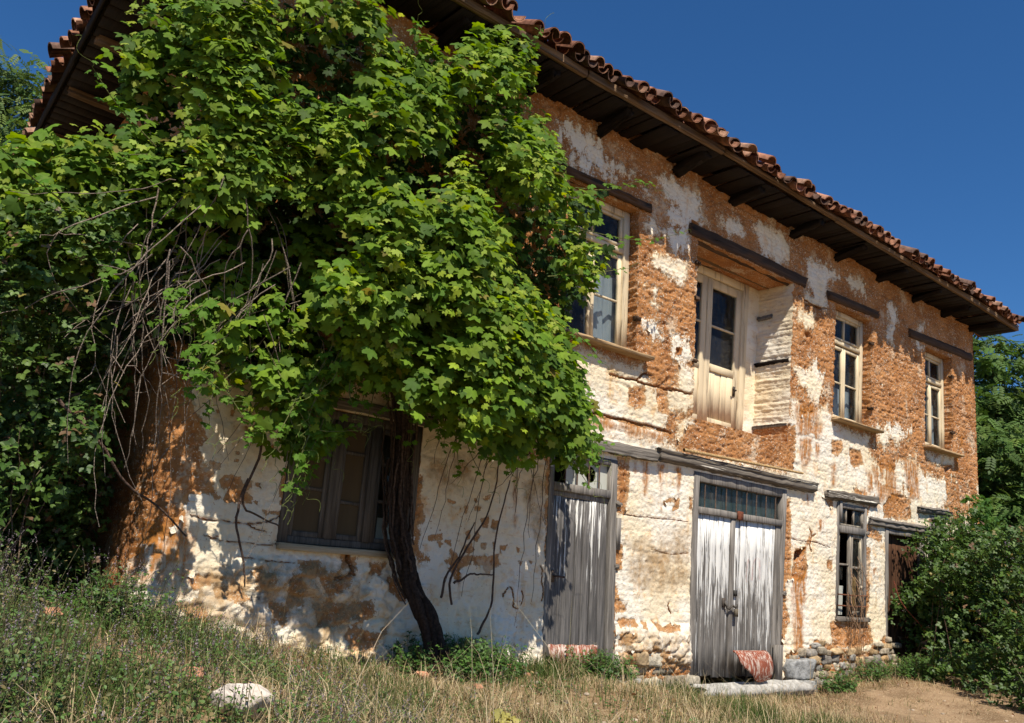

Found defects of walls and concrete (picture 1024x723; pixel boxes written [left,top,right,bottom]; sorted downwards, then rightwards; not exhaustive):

flaking render [112,73,202,141]
flaking render [242,0,483,127]
flaking render [363,85,979,524]
flaking render [47,186,365,603]
flaking render [187,554,406,652]
flaking render [614,544,691,681]
flaking render [782,497,886,680]